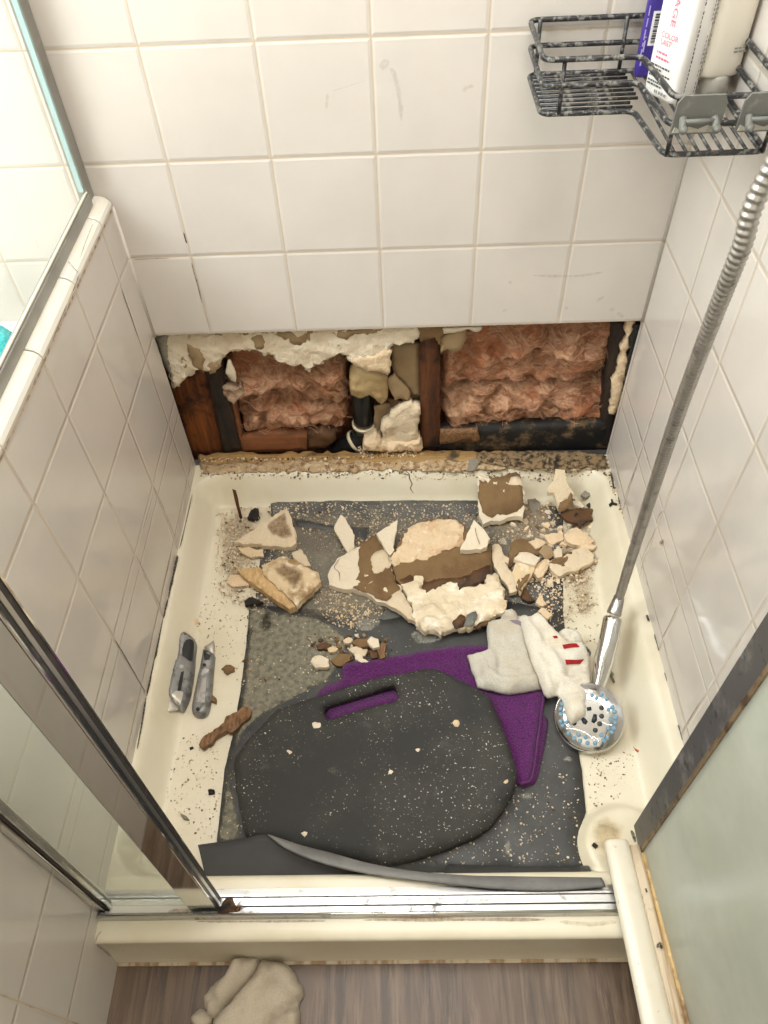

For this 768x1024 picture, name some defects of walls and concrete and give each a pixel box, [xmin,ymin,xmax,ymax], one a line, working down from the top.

peeling [155,328,420,390]
spalling [608,321,635,415]
corrosion [218,897,252,922]